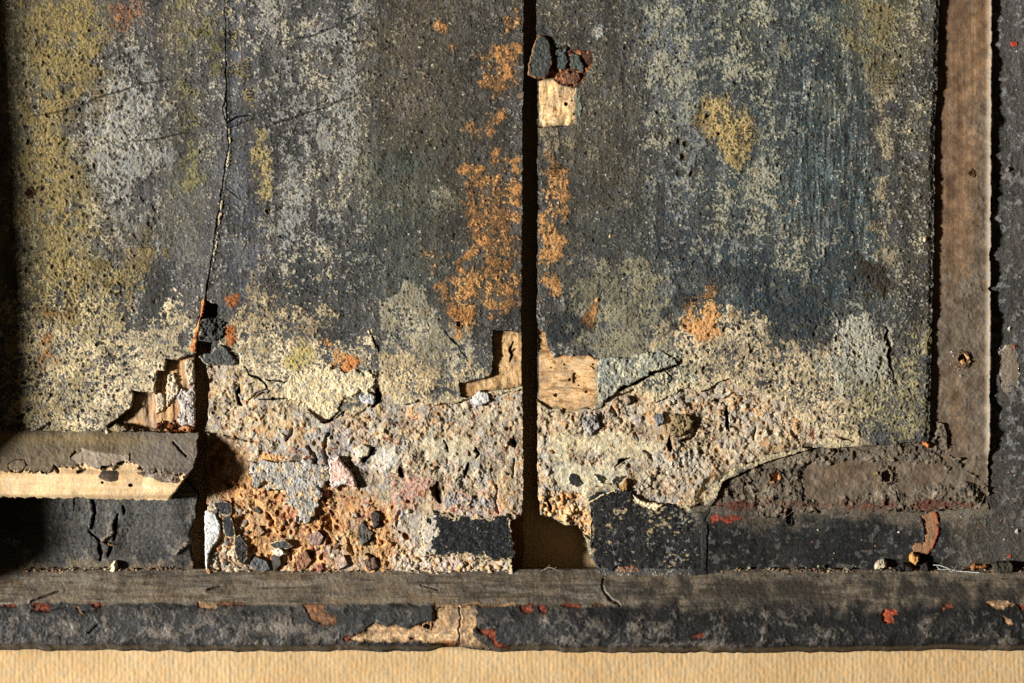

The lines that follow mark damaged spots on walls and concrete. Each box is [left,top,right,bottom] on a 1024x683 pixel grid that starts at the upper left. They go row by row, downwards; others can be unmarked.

rust [479,9,522,98]
peeling [528,35,593,127]
crack [207,7,250,286]
rust [434,148,522,339]
rust [538,150,570,297]
rust [681,285,733,343]
crack [608,365,677,399]
spalling [109,318,524,574]
crack [73,498,126,561]